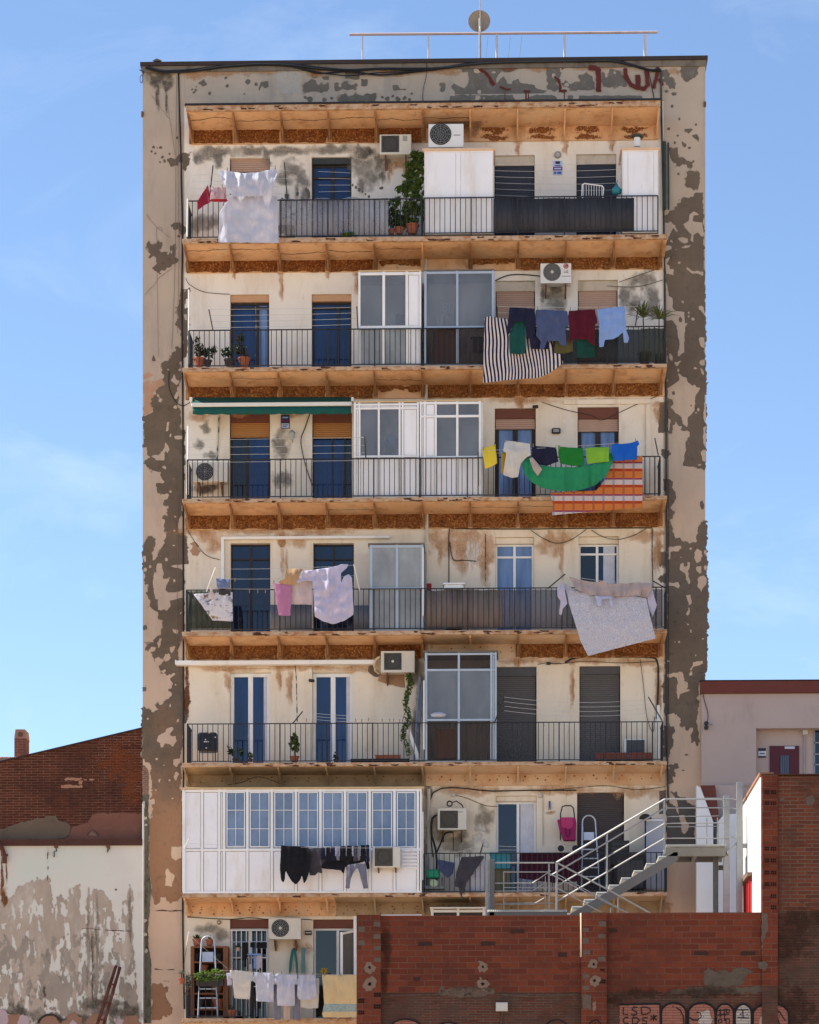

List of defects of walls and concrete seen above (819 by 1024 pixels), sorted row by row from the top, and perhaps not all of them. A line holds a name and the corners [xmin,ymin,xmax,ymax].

peeling [241,79,269,110]
peeling [274,68,642,109]
water stain [194,146,229,167]
water stain [242,146,310,203]
water stain [319,144,388,191]
peeling [0,118,710,1024]